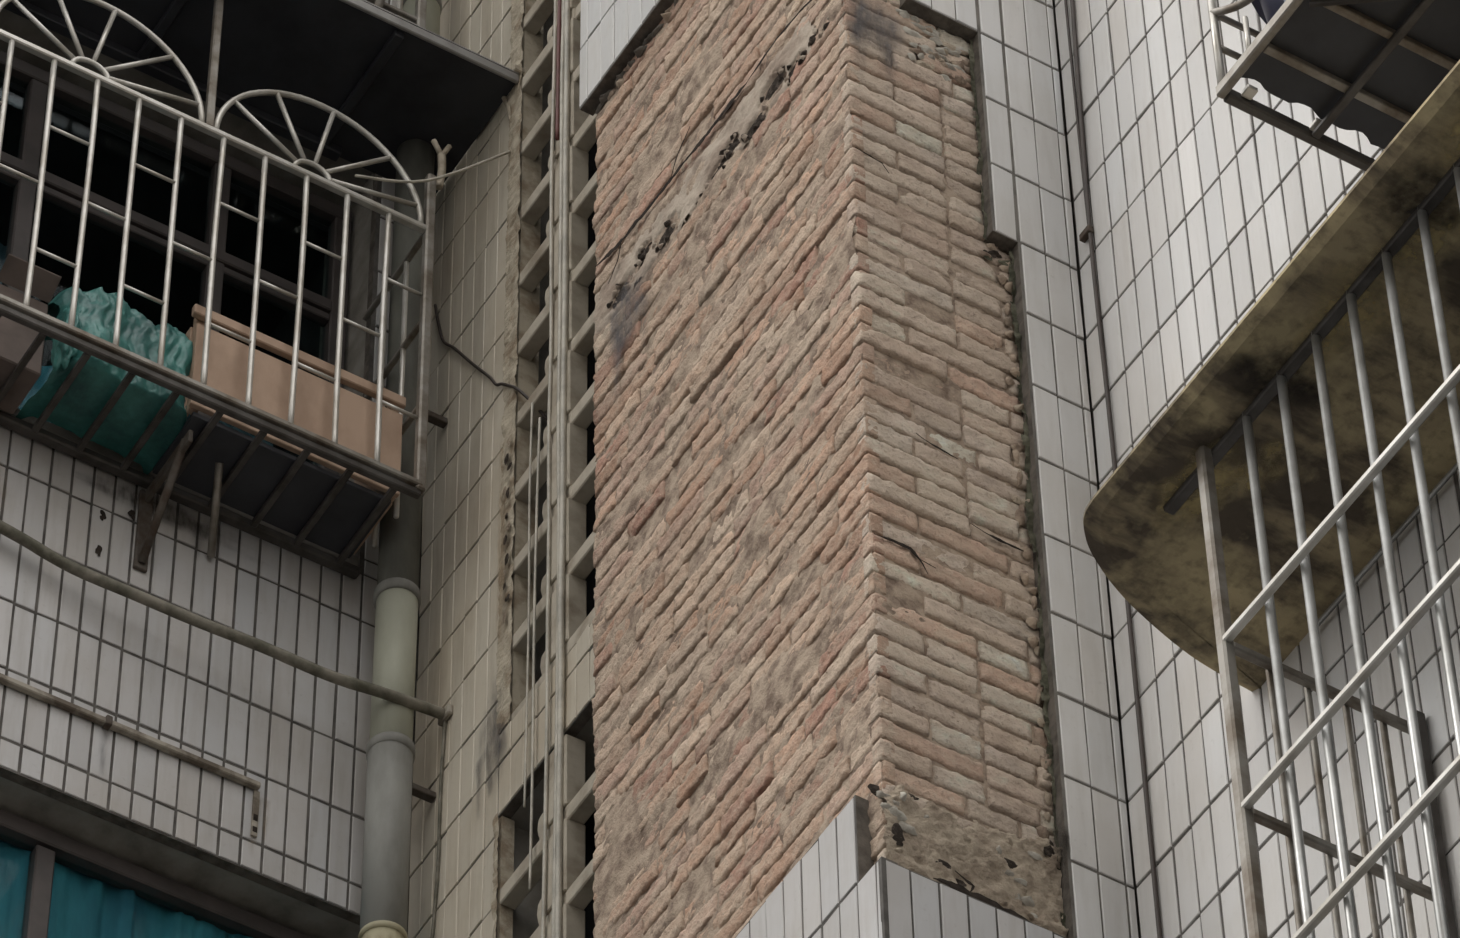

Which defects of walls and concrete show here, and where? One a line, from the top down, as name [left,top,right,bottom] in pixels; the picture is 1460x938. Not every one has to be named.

spalling [979,243,1020,385]
damp [1234,359,1319,402]
damp [1166,450,1250,513]
spalling [867,755,1068,937]